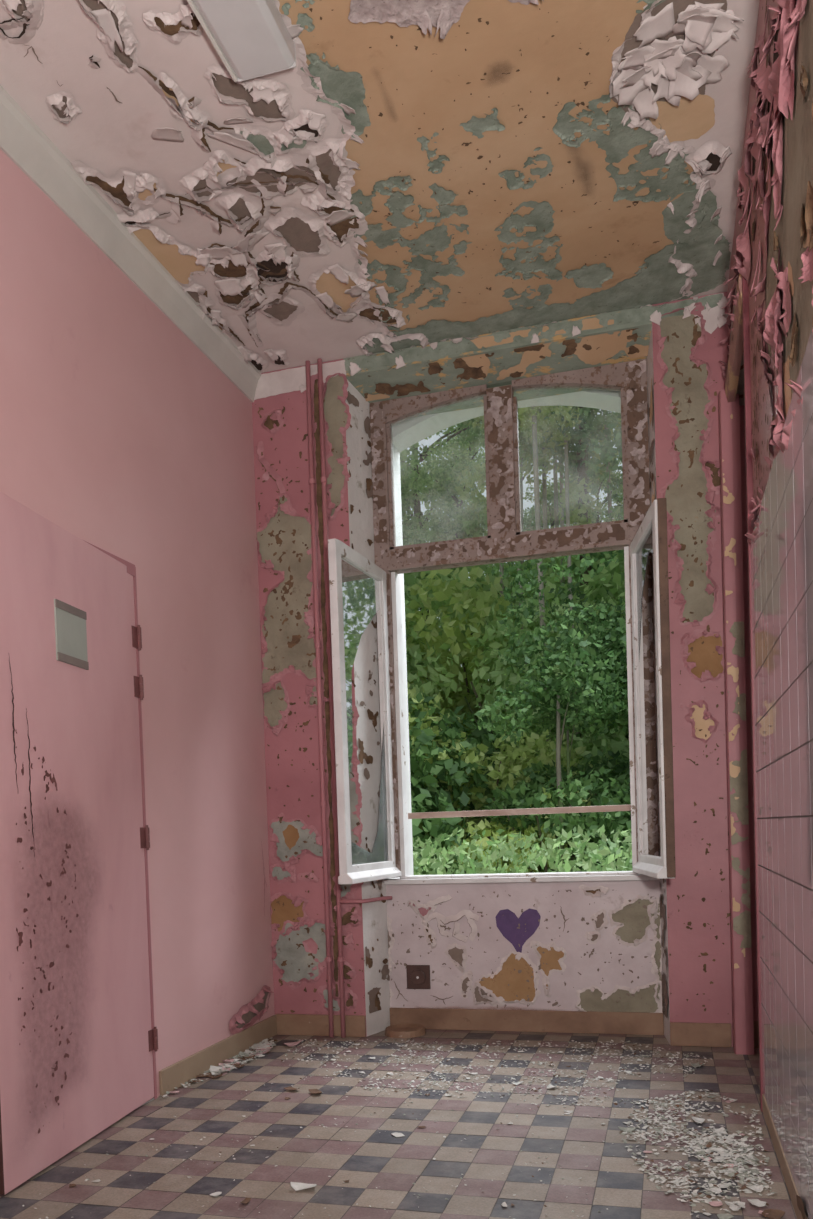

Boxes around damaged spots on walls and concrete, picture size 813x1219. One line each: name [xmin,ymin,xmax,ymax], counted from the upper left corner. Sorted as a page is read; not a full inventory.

peeling [0,0,44,28]
peeling [45,91,82,124]
peeling [71,0,813,1035]